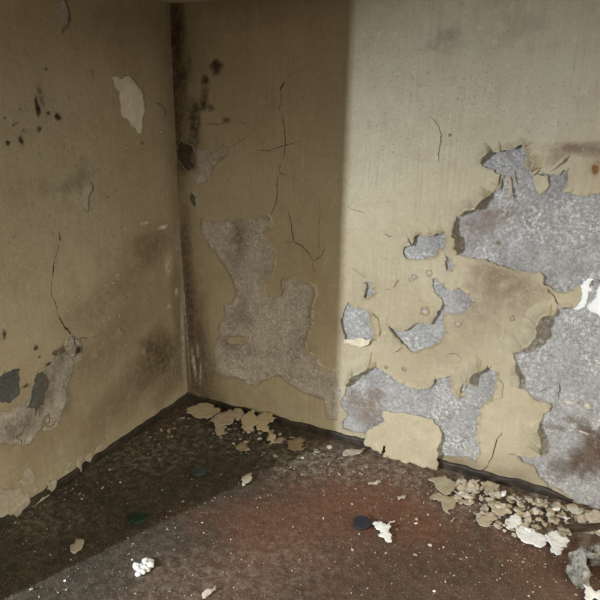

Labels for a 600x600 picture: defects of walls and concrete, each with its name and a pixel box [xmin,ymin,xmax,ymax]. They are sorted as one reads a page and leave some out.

peeling [111,73,147,136]
damp [171,3,194,170]
peeling [176,139,231,210]
crack [261,74,325,273]
crack [51,233,86,345]
peeling [199,134,600,515]
peeling [0,333,85,448]
peeling [0,467,58,518]
peeling [63,443,104,474]